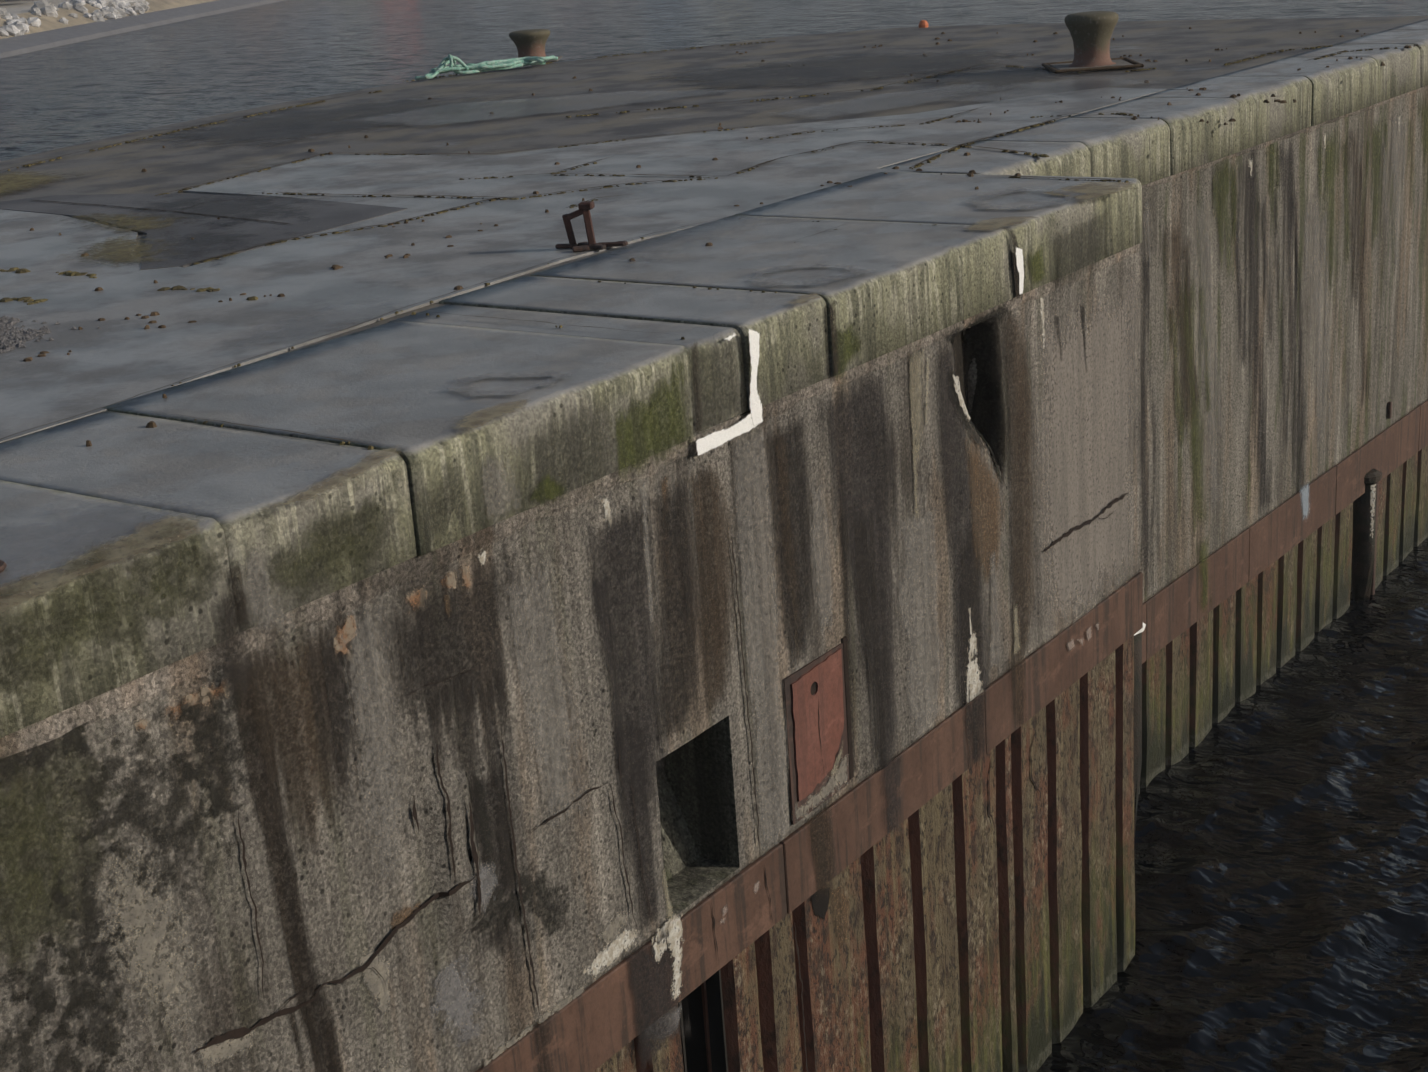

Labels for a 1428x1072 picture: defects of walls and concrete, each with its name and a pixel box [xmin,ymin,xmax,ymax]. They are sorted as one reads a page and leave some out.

leakage [73,553,344,1072]
rust [334,616,356,653]
crack [193,731,653,1068]
leakage [313,564,578,933]
rust [444,552,486,615]
leakage [591,484,697,1065]
rust [694,469,736,707]
spalling [947,306,1008,485]
rust [1007,316,1033,656]
crack [1042,493,1128,552]
leakage [1140,358,1155,584]
leakage [1235,147,1328,517]